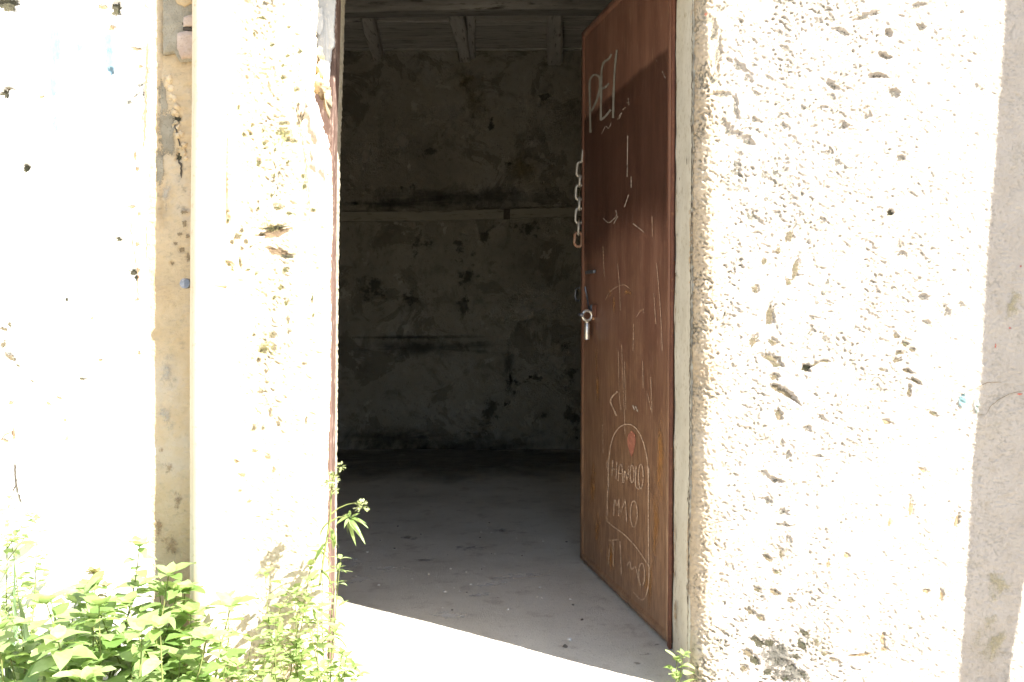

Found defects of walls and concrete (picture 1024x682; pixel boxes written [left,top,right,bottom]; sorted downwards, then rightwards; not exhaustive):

flaking render [162,0,192,63]
crack [174,126,182,178]